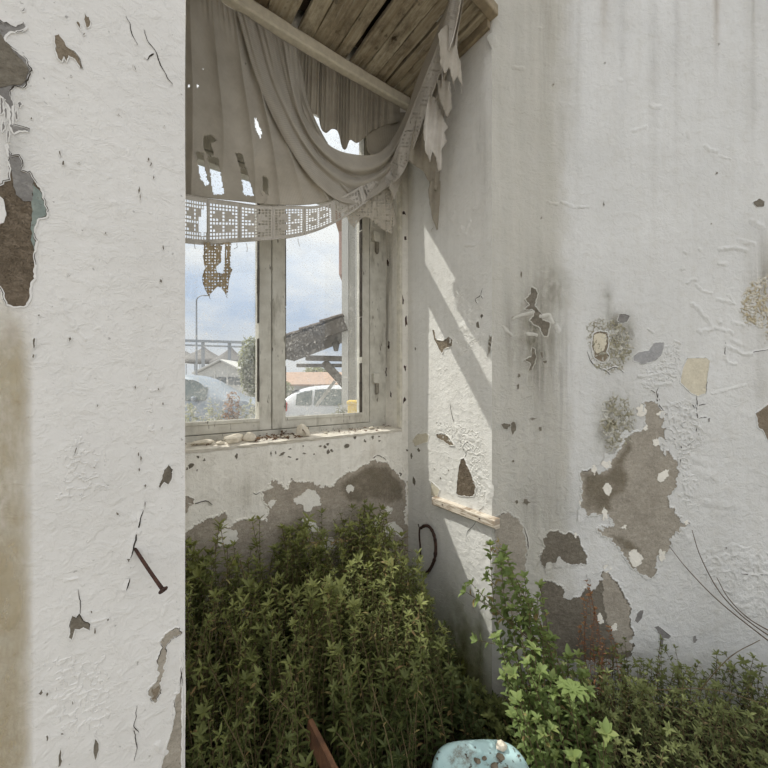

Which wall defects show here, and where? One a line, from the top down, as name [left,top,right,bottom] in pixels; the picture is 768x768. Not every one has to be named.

crack [122,16,173,86]
spalling [0,7,50,308]
peeling [523,286,551,338]
peeling [406,421,490,502]
peeling [501,421,517,435]
spalling [577,392,692,581]
peeling [67,610,97,641]
peeling [146,626,183,705]
spalling [185,458,420,610]
spalling [490,498,531,617]
spalling [532,528,644,664]
peeling [92,736,100,763]